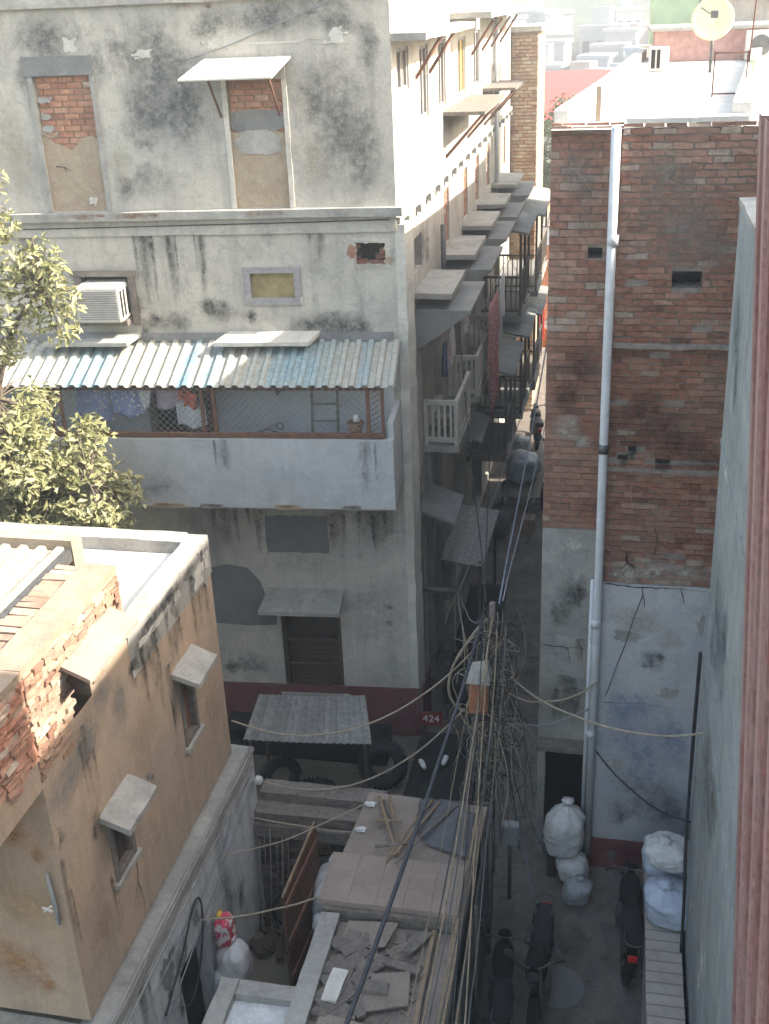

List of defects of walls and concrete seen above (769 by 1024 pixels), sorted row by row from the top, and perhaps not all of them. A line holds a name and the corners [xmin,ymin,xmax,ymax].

water stain [136,34,195,126]
flaking render [37,97,59,135]
spalling [347,237,393,271]
flaking render [194,547,209,591]
flaking render [139,589,181,649]